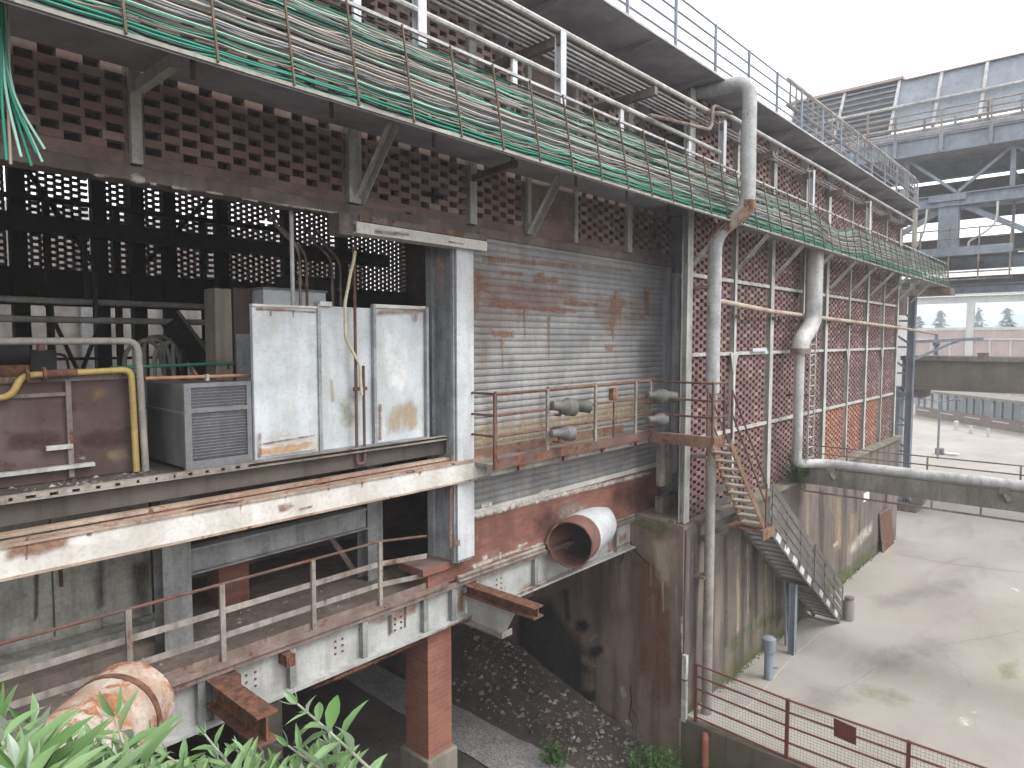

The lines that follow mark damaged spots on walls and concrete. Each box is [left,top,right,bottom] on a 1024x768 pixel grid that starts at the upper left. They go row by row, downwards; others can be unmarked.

corrosion [473,273,488,314]
corrosion [490,257,596,333]
corrosion [11,434,58,448]
corrosion [258,433,311,458]
leakage [806,490,824,553]
corrosion [9,531,74,559]
leakage [651,540,677,636]
corrosion [638,561,669,699]
corrosion [334,657,385,680]